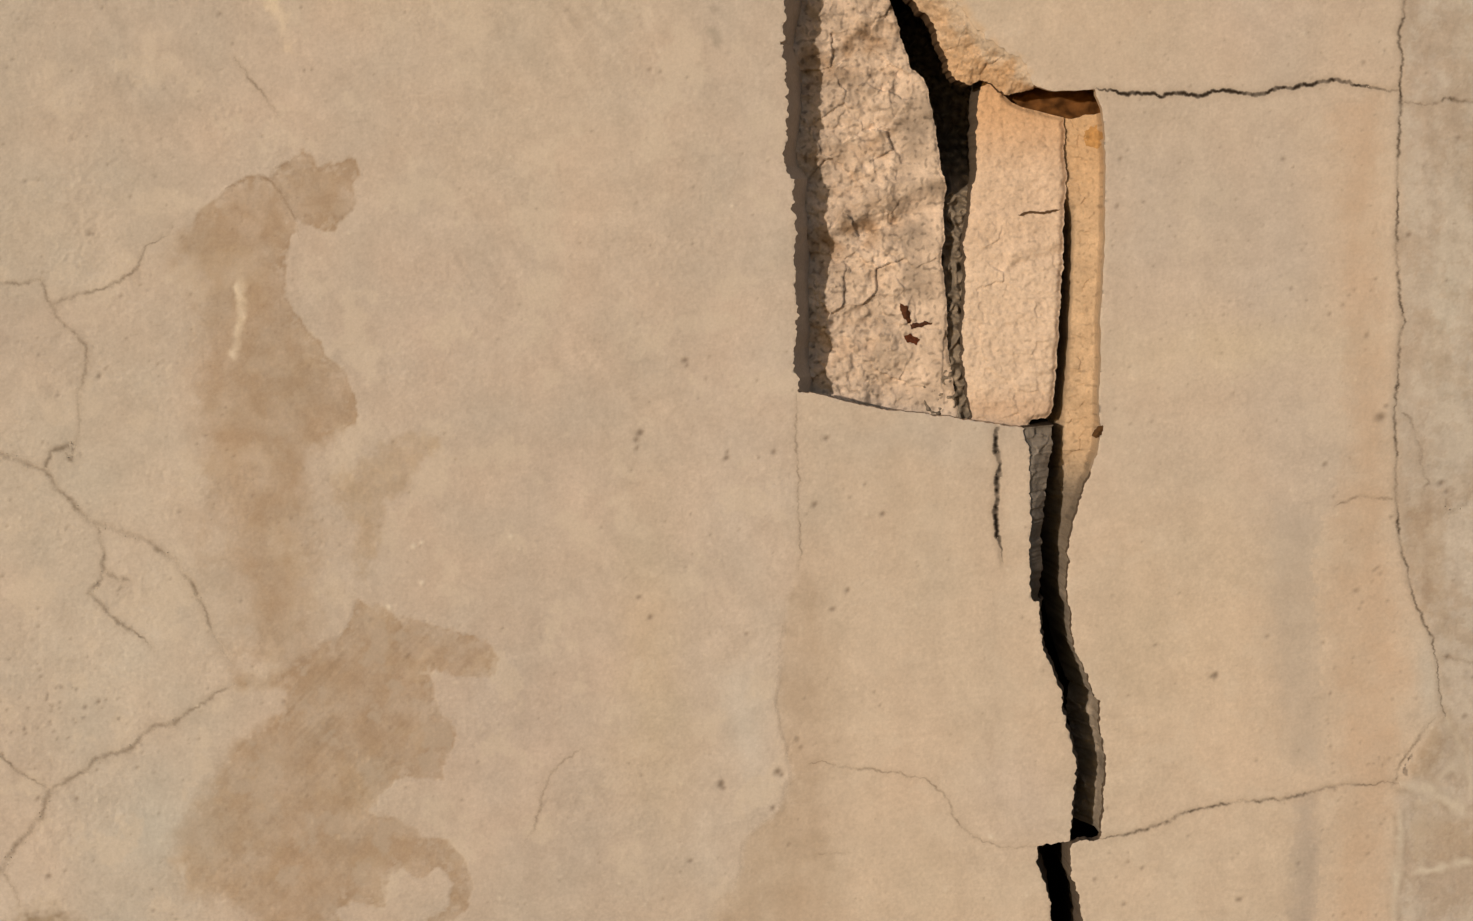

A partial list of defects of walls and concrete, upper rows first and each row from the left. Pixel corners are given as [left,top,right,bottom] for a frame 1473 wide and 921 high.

crack [0,234,235,907]
leakage [148,146,363,675]
spalling [780,0,1104,451]
crack [808,0,1473,921]